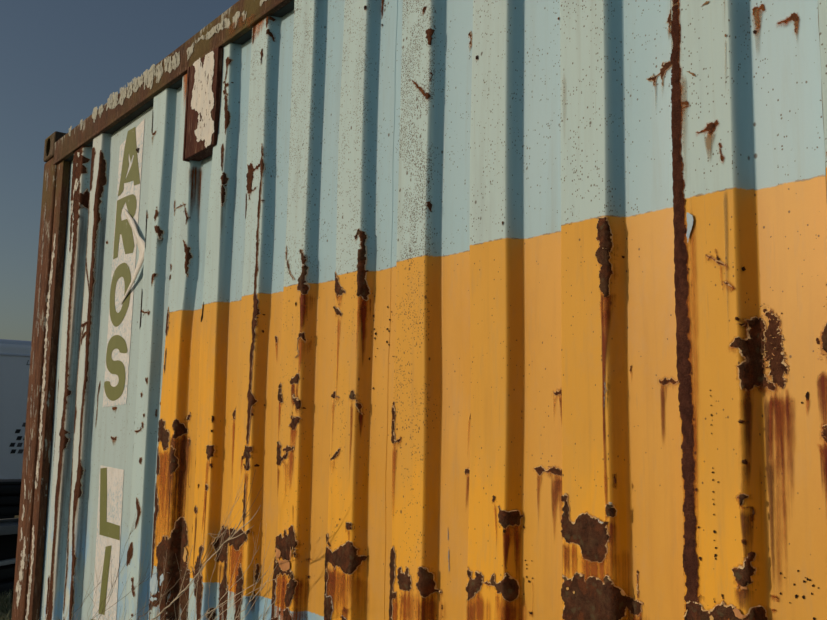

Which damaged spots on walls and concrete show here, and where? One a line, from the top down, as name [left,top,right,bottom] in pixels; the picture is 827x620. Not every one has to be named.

peeling [69,11,246,148]
corrosion [45,146,108,620]
corrosion [534,216,644,620]
corrosion [729,303,792,565]
corrosion [801,373,827,482]
corrosion [816,323,827,360]
corrosion [149,402,260,620]
corrosion [271,525,310,620]
corrosion [324,519,368,620]
corrosion [389,546,443,620]
corrosion [466,495,532,620]
corrosion [684,493,778,620]